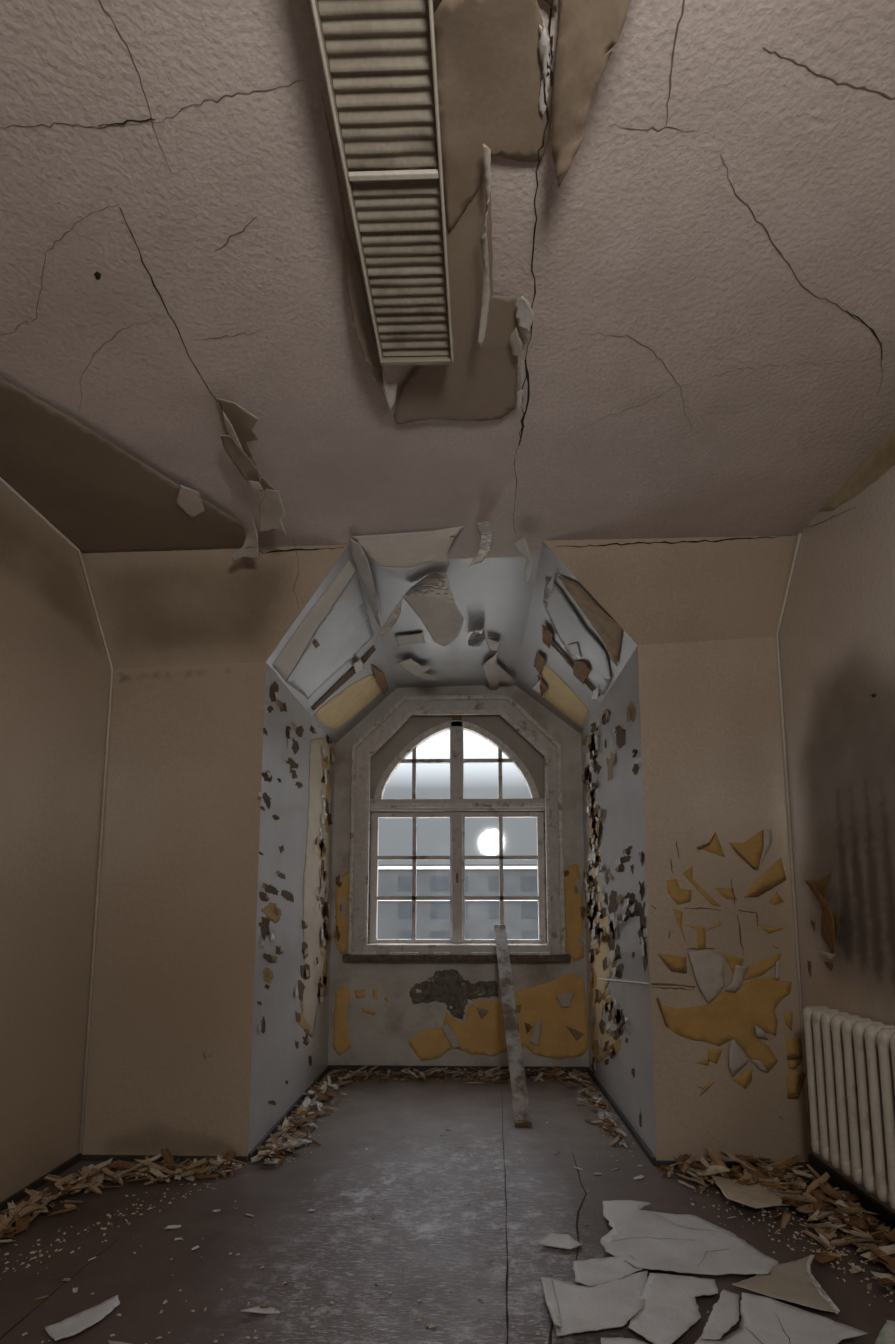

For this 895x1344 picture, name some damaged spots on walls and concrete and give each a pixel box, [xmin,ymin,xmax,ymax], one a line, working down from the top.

crack [0,0,304,171]
crack [609,0,695,132]
crack [763,47,895,100]
crack [0,204,258,421]
peeling [321,0,631,424]
crack [513,0,554,535]
crack [578,154,883,429]
peeling [0,378,287,563]
peeling [256,521,516,1066]
peeling [407,574,806,1146]
peeling [804,871,839,977]
crack [572,1152,587,1261]